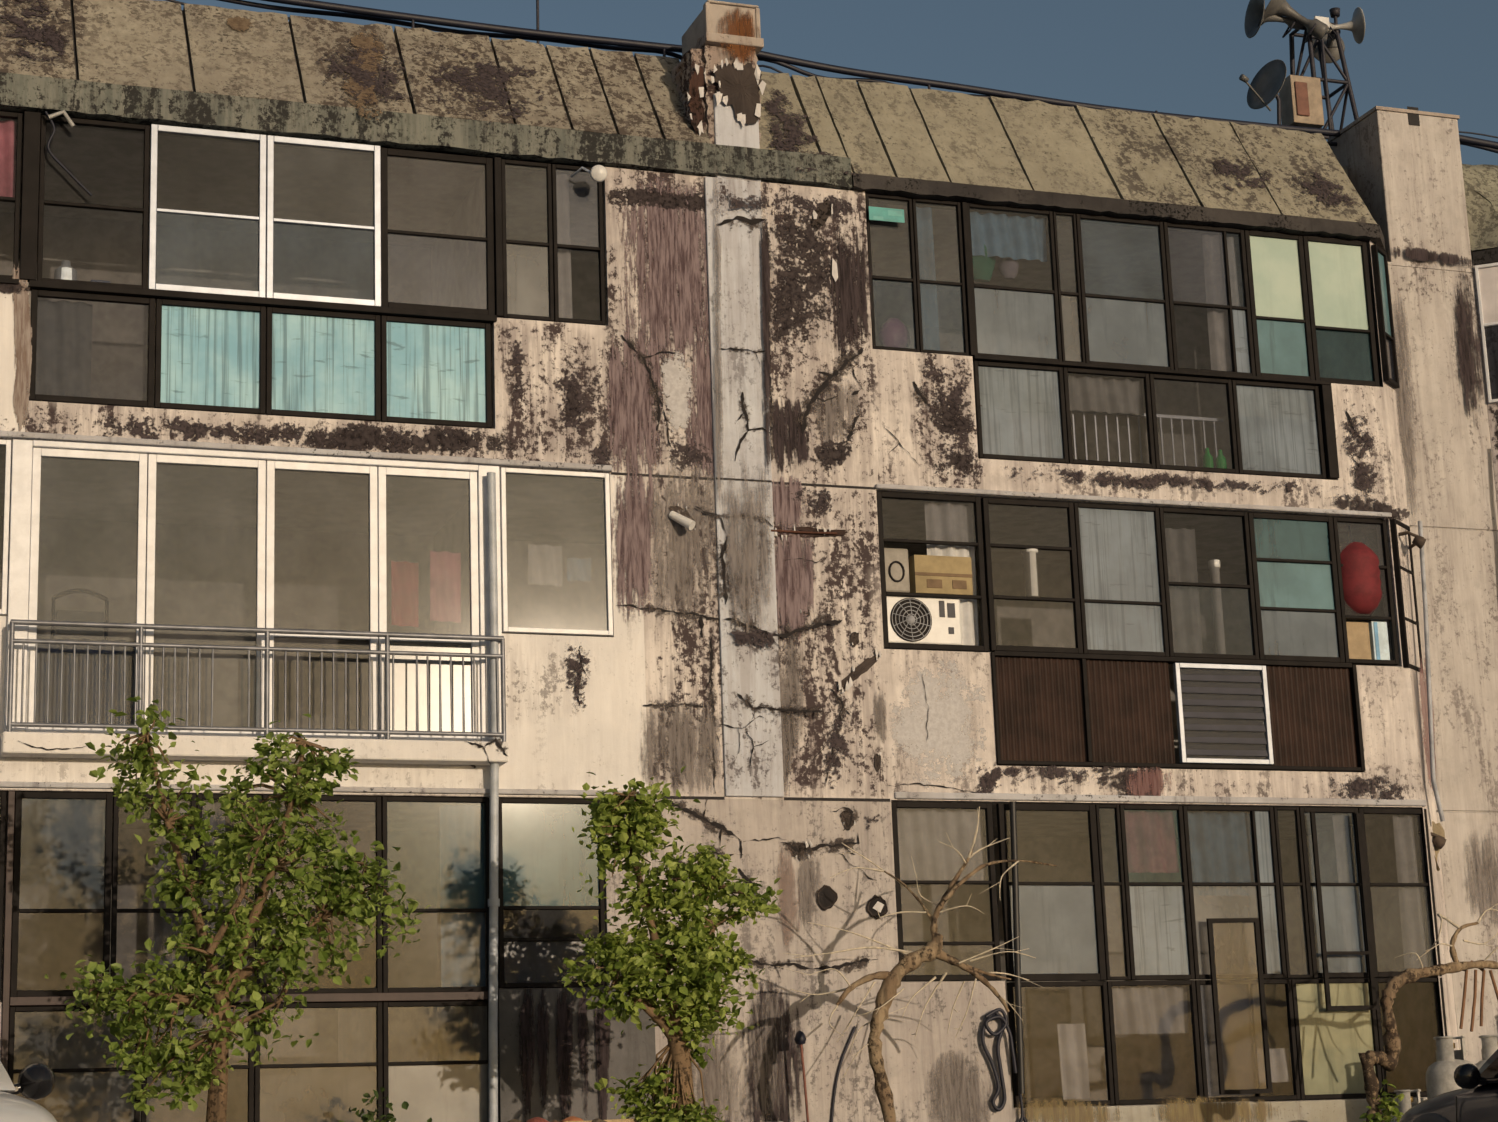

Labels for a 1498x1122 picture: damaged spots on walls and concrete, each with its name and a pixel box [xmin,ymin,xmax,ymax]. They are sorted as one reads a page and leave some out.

corrosion [718,8,755,63]
leakage [316,39,547,127]
leakage [762,88,862,176]
mould [1,412,525,456]
leakage [509,327,527,413]
mould [918,341,982,477]
leakage [1393,246,1498,460]
leakage [553,177,872,794]
leakage [688,982,805,1122]
leakage [928,1050,992,1122]